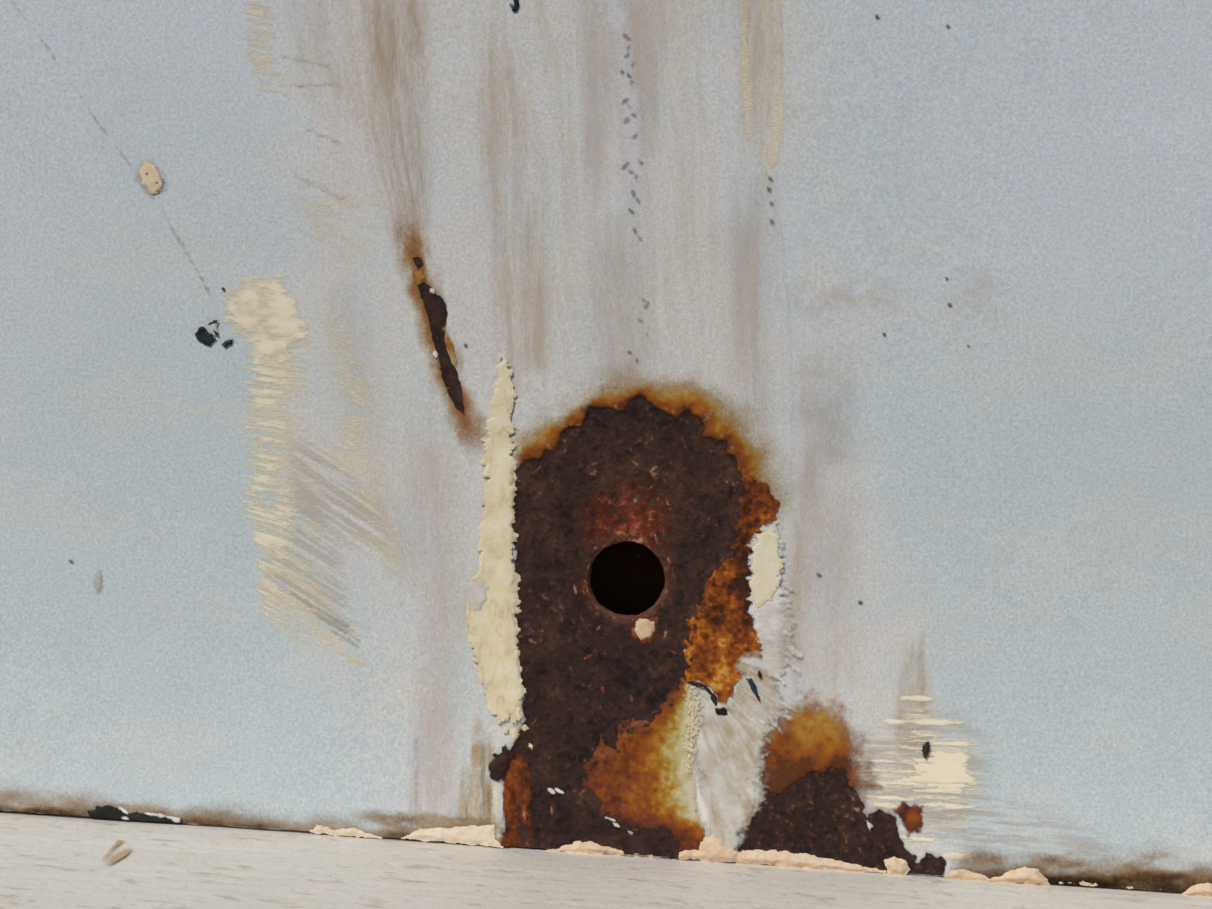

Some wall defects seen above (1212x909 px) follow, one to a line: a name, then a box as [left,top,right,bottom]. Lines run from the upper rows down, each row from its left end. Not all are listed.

corrosion [402,232,483,440]
damp [0,791,501,844]
peeling [195,274,396,664]
peeling [458,725,501,836]
peeling [465,354,533,750]
corrosion [488,377,780,859]
peeling [681,521,802,862]
corrosion [737,701,946,876]
damp [961,851,1212,893]